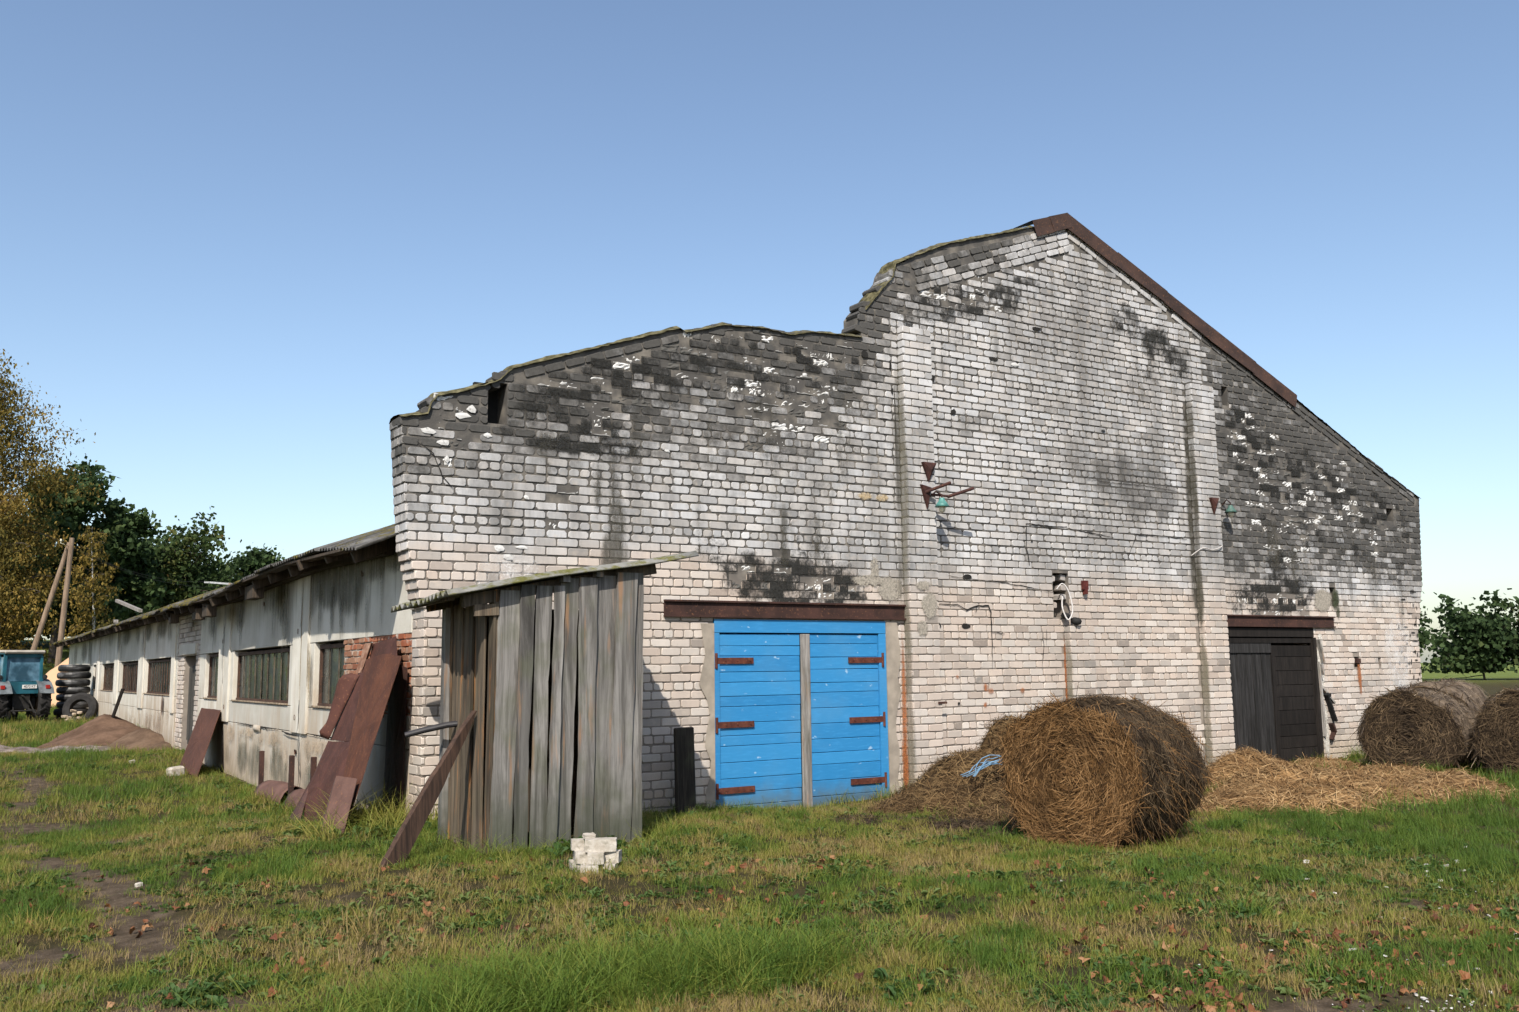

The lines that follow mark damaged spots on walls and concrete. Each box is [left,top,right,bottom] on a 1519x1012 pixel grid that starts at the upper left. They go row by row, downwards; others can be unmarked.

damp [1111,302,1189,383]
spalling [421,392,476,467]
spalling [537,357,650,437]
spalling [661,326,868,451]
spalling [1227,413,1405,569]
spalling [494,545,528,560]
damp [699,378,937,697]
damp [265,548,401,702]
spalling [1238,593,1308,616]